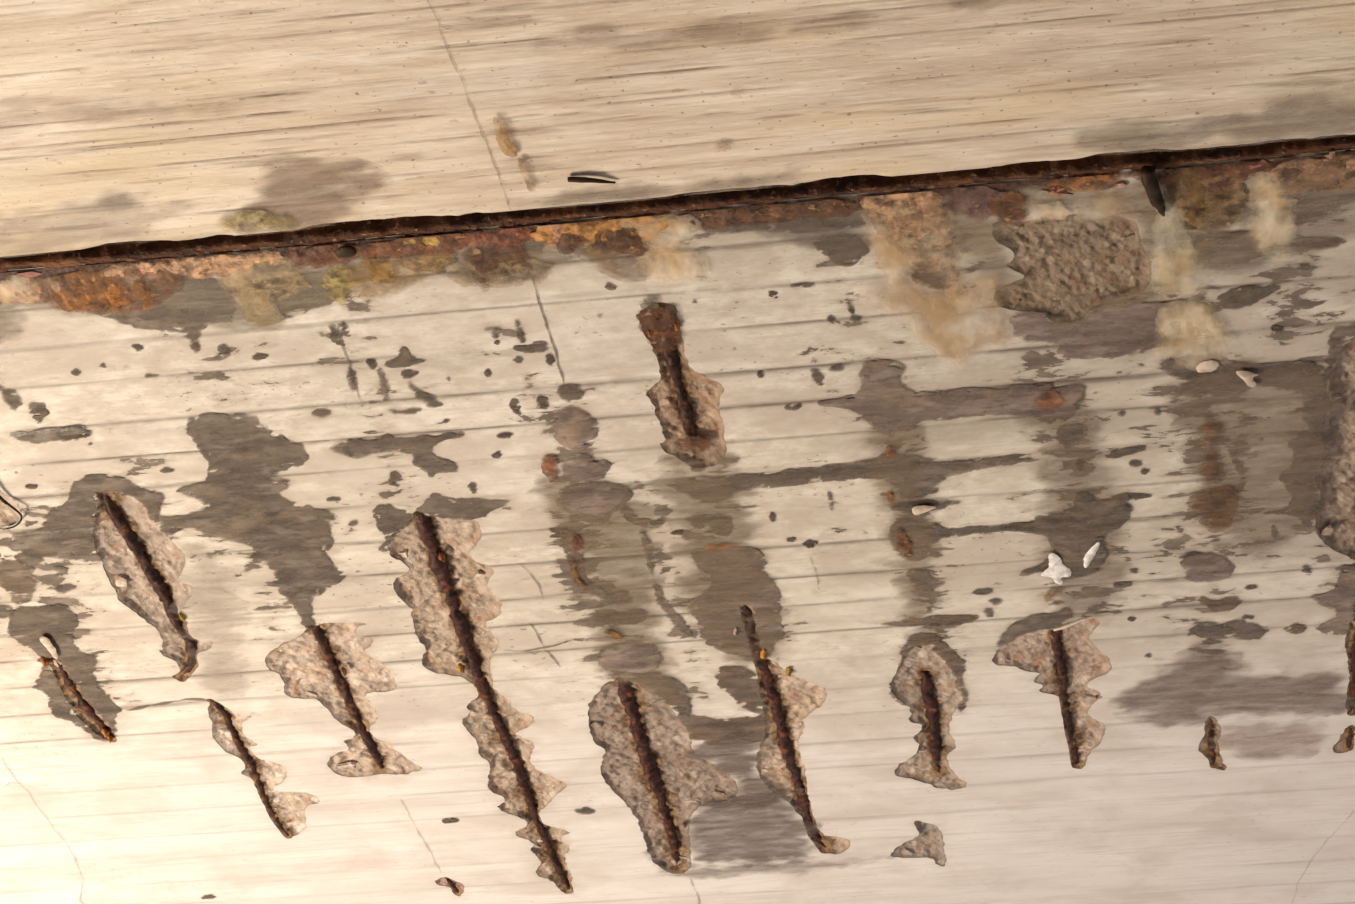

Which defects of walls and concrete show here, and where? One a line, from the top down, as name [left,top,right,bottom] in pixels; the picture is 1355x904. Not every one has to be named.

crack [529,271,564,383]
damp [642,221,701,281]
rust [0,150,1355,316]
damp [758,199,1020,358]
damp [1017,173,1355,349]
peeling [0,413,422,777]
spalling [549,302,1151,874]
spalling [1161,326,1355,753]
spalling [207,699,320,839]
spalling [372,483,574,896]
damp [676,738,830,877]
damp [1118,647,1353,758]